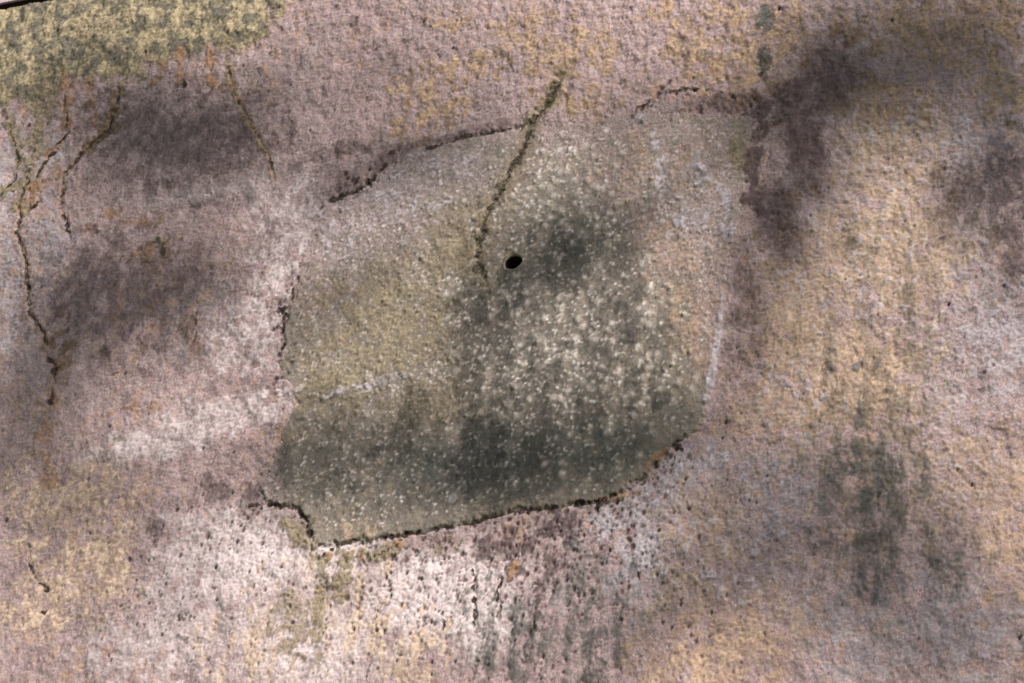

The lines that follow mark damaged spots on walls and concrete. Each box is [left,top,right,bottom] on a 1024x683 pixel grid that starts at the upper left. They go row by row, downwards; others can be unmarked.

crack [2,95,119,404]
leakage [147,3,623,380]
crack [425,76,562,284]
leakage [544,0,1024,683]
leakage [0,391,291,647]
peeling [278,515,310,548]
leakage [139,500,550,683]
crack [248,502,444,555]
peeling [326,537,406,603]
spalling [473,505,594,581]
crack [513,433,686,513]
peeling [599,479,797,606]